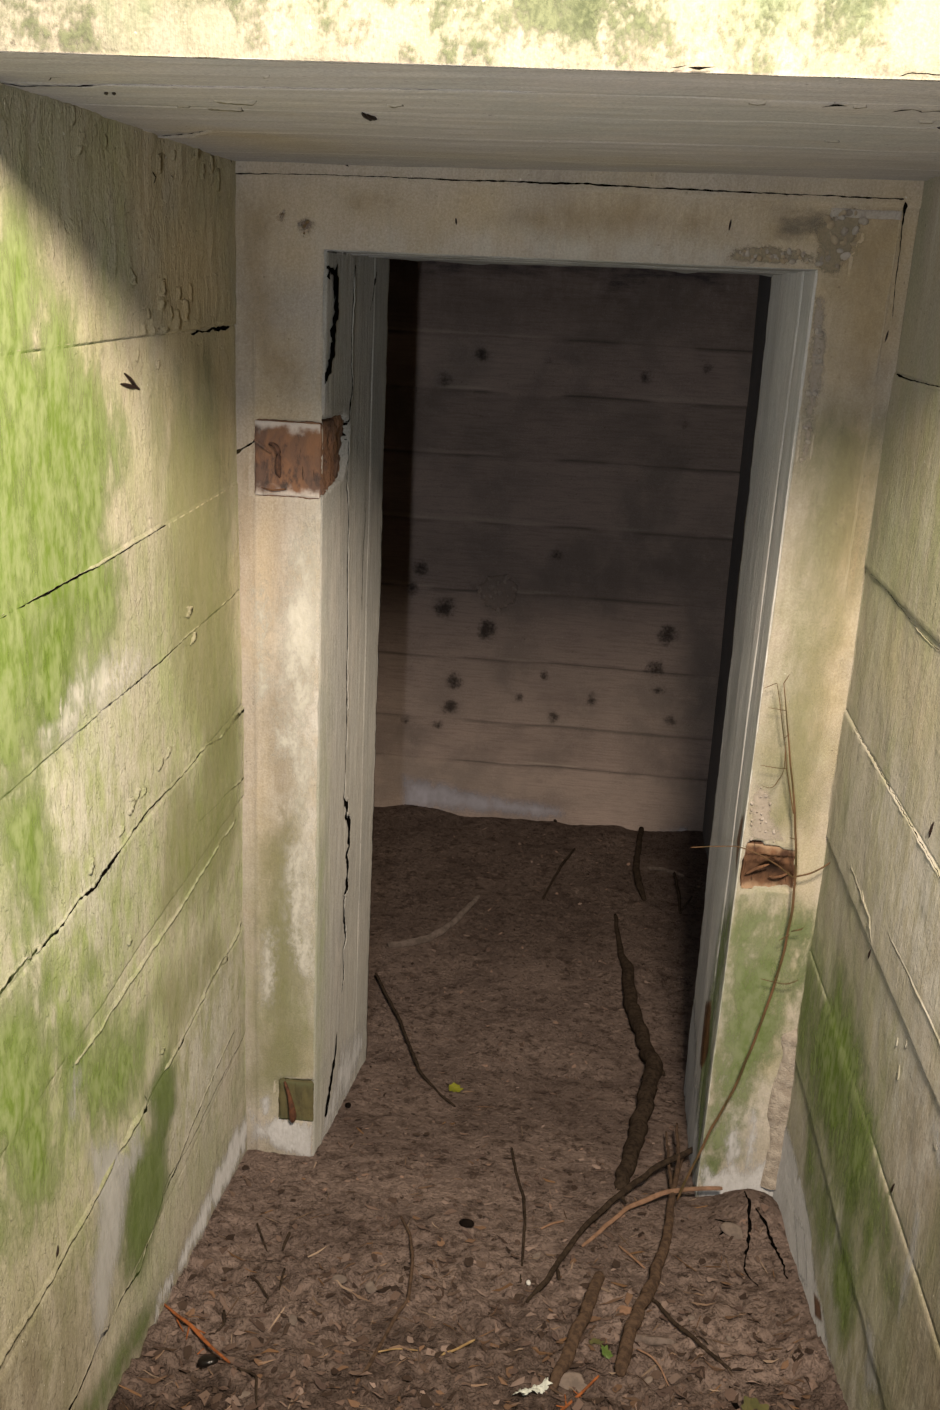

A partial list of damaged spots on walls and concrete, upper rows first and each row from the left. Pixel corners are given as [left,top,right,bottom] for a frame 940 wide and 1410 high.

leakage [13,4,100,52]
leakage [579,5,682,65]
spalling [731,209,869,272]
leakage [34,600,139,748]
crack [325,264,377,990]
leakage [0,788,53,947]
leakage [61,1020,174,1131]
leakage [94,1144,141,1330]
leakage [684,1008,853,1360]